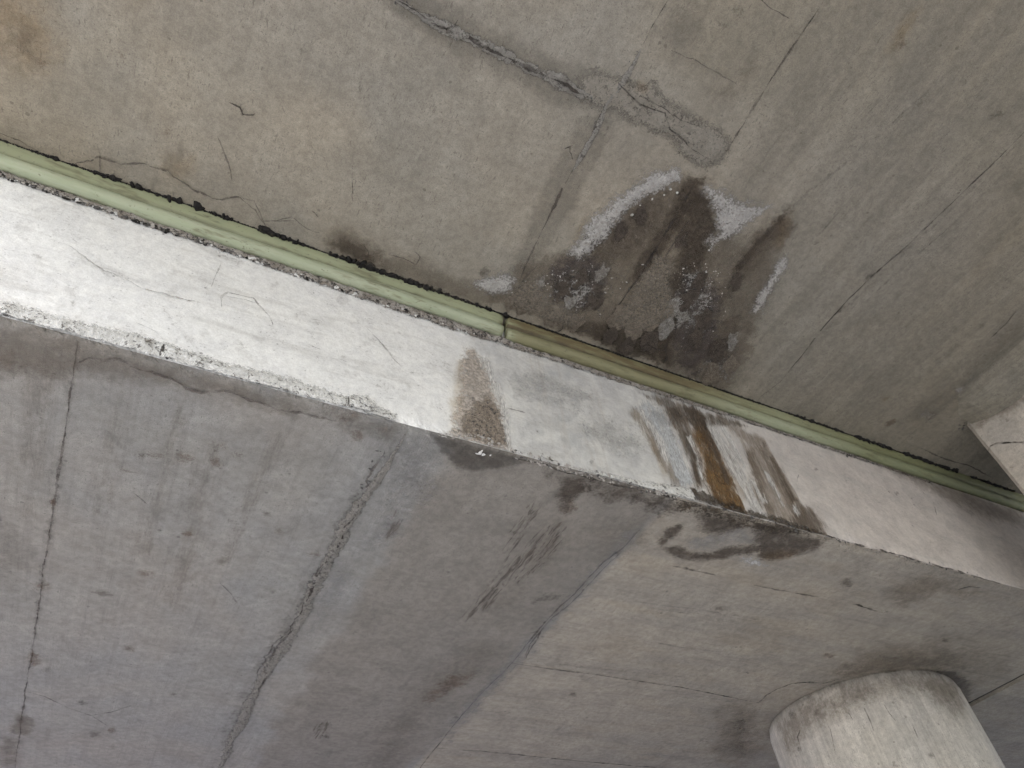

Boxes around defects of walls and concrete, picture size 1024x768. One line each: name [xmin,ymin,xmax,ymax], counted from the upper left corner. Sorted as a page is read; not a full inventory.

crack [394,0,664,237]
damp [460,167,796,390]
crack [763,250,903,395]
crack [924,150,1007,230]
crack [15,342,78,761]
crack [218,431,408,768]
damp [462,394,827,620]
corrosion [691,417,747,515]